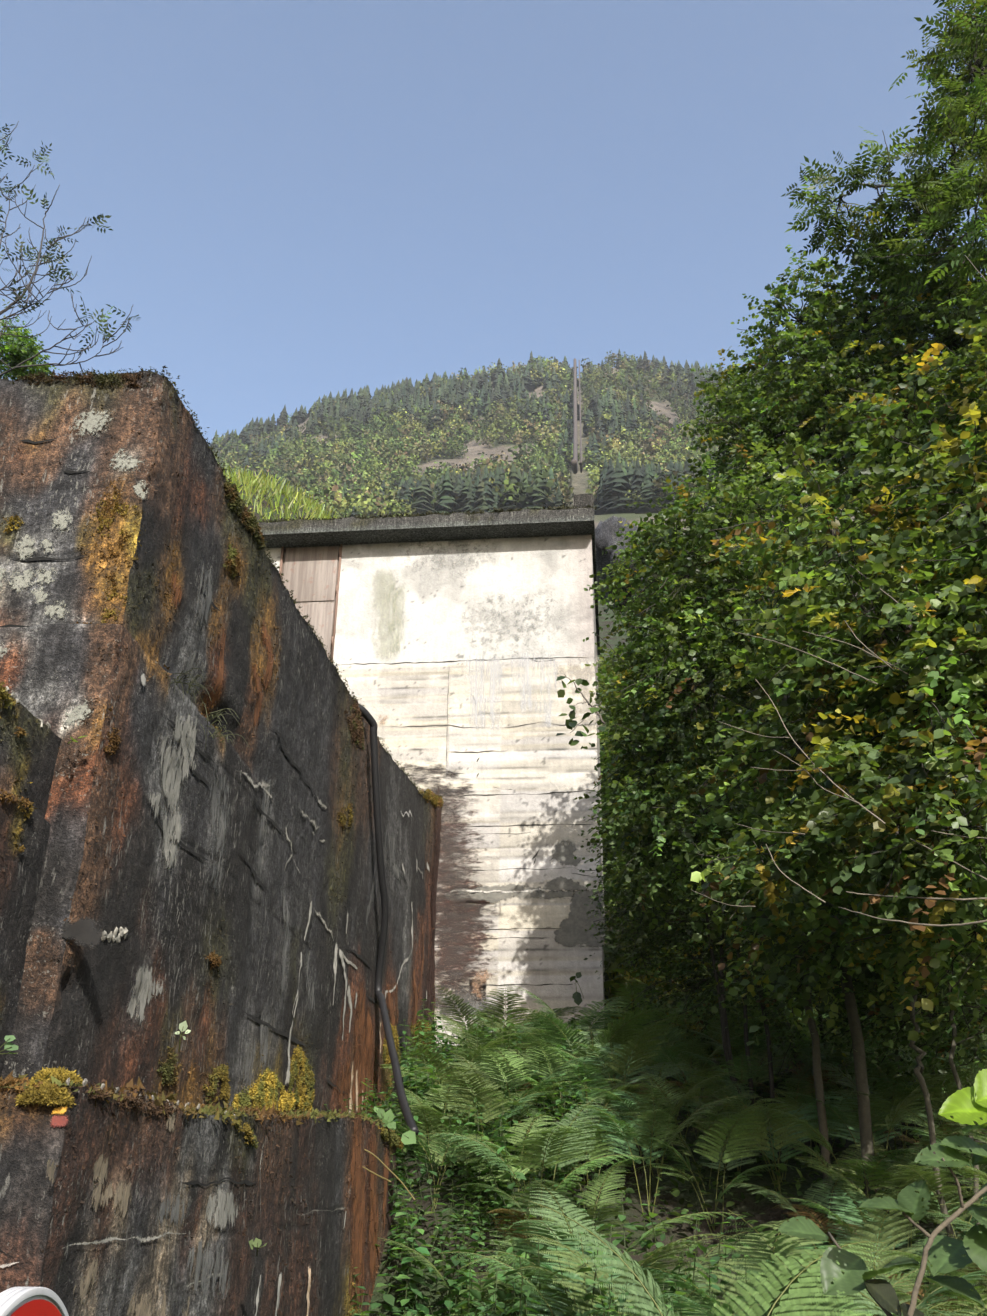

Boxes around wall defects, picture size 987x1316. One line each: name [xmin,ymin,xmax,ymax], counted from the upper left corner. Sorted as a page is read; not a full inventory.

peeling [149,714,197,868]
peeling [208,774,230,890]
damp [239,1007,270,1091]
damp [281,890,315,1084]
damp [333,913,358,1041]
damp [349,1061,363,1113]
damp [385,902,413,999]
damp [402,790,605,1021]